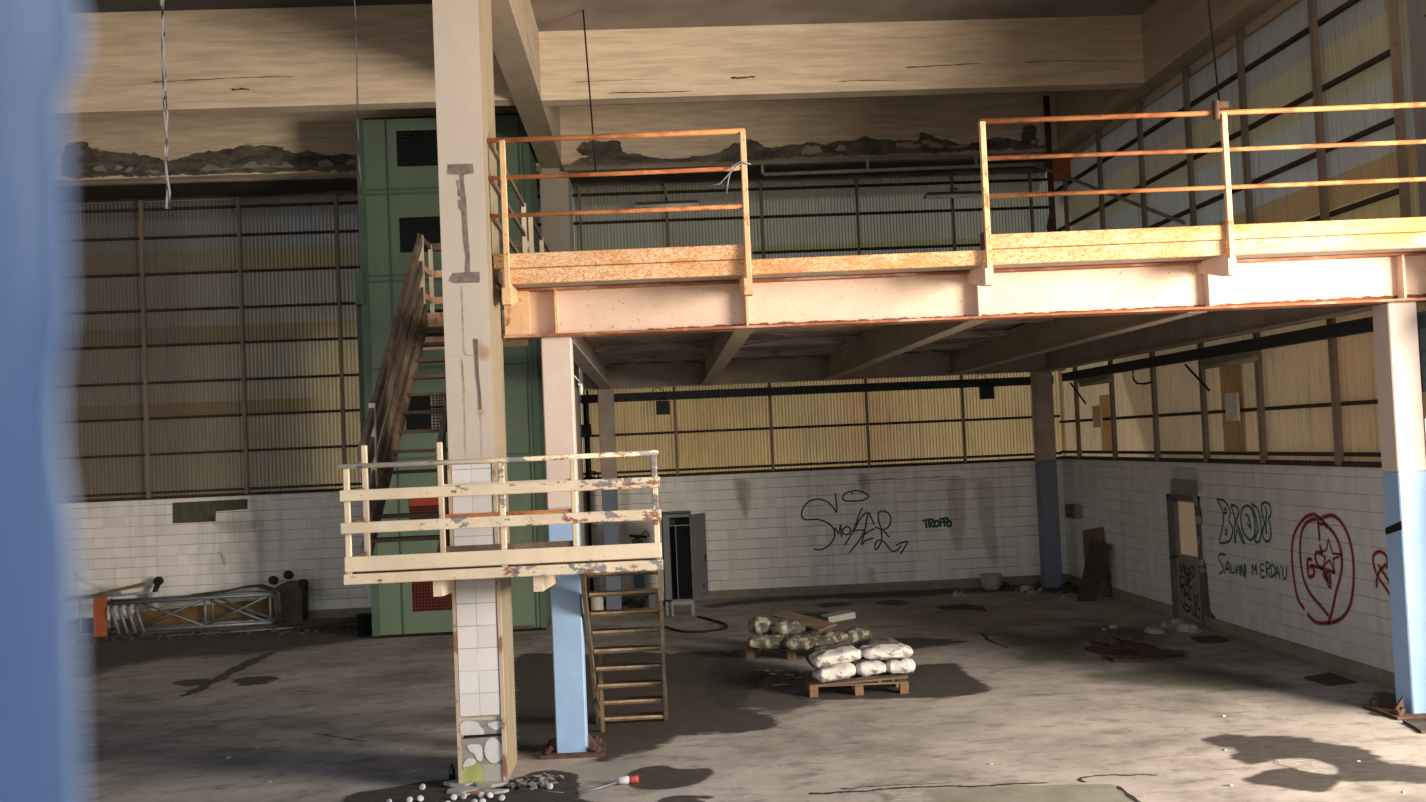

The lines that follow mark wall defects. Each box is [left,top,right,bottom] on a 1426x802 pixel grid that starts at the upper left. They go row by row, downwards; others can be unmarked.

peeling [66,141,357,180]
peeling [571,125,1046,165]
peeling [172,499,248,523]
peeling [460,719,503,782]